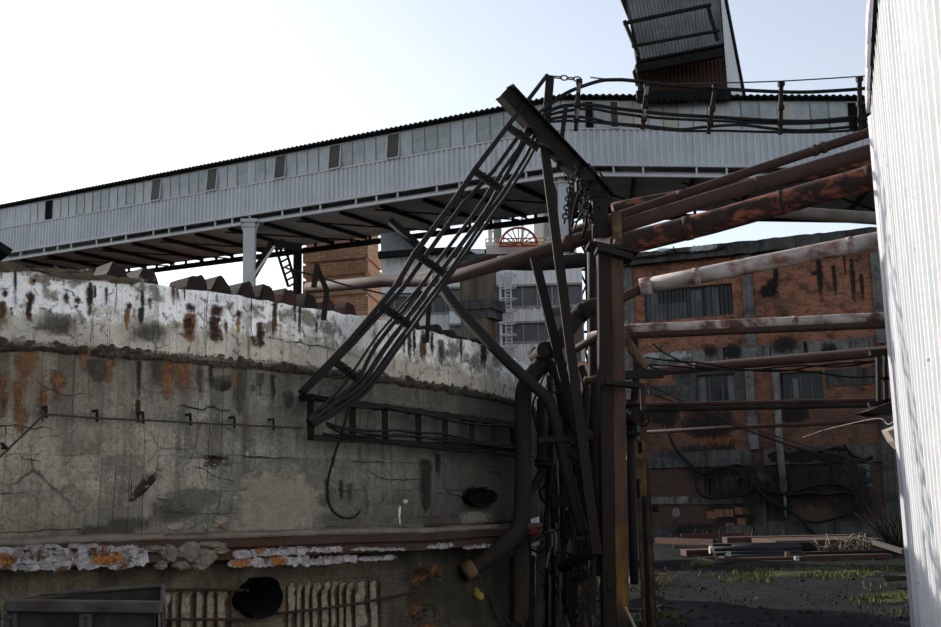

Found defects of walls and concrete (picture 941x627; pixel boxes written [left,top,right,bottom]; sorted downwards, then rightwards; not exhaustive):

rust [26,278,35,320]
rust [172,285,197,342]
rust [208,304,243,341]
rust [251,322,265,346]
leakage [812,255,864,301]
crack [179,404,229,412]
crack [0,424,53,467]
spalling [121,467,165,507]
crack [187,455,295,532]
leakage [420,454,441,512]
spalling [459,485,497,525]
peeling [0,543,167,573]